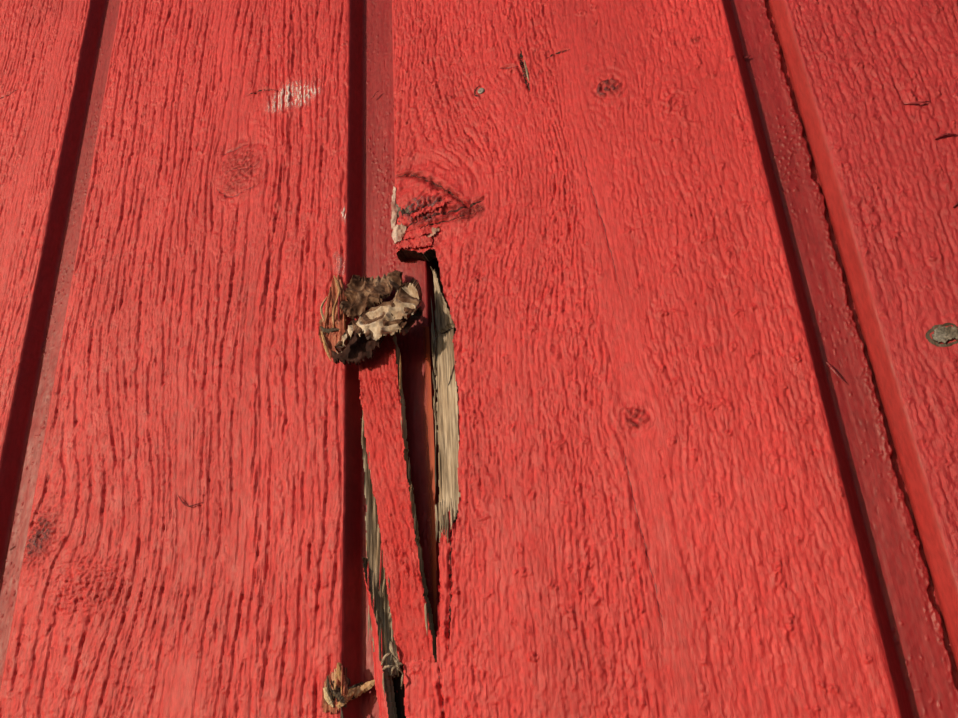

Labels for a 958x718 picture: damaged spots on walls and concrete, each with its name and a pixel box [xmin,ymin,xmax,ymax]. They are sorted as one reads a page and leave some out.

spalling [358,266,461,718]
crack [438,522,452,718]